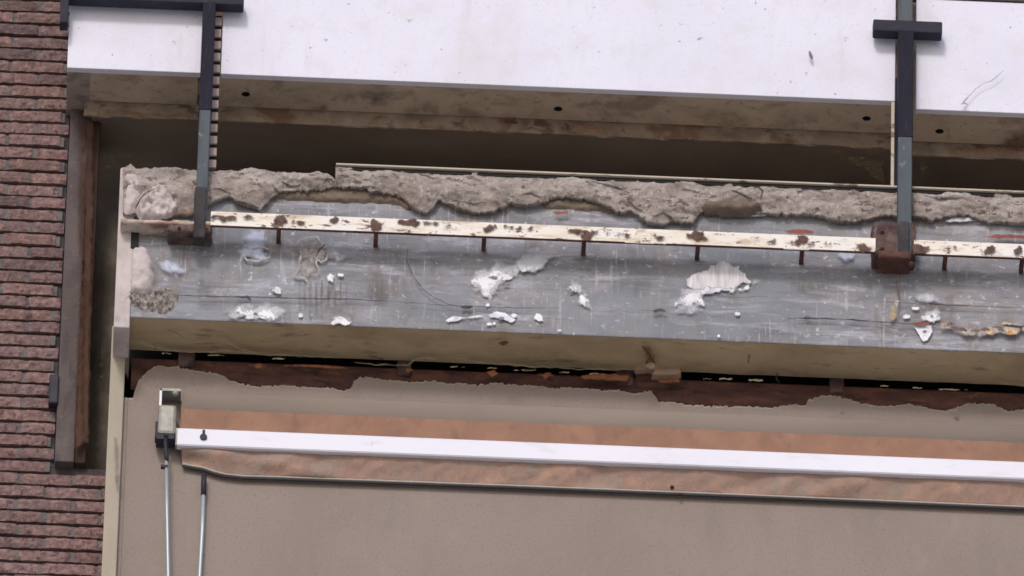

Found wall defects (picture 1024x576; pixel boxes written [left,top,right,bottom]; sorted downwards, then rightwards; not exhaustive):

rust [274,214,305,226]
rust [398,218,451,236]
spalling [123,164,897,227]
rust [568,229,630,241]
rust [686,230,708,240]
rust [787,229,831,245]
spalling [912,192,1024,227]
rust [980,234,1024,255]
peeling [229,287,285,321]
peeling [446,261,520,325]
peeling [675,261,755,314]
spalling [903,307,1024,341]